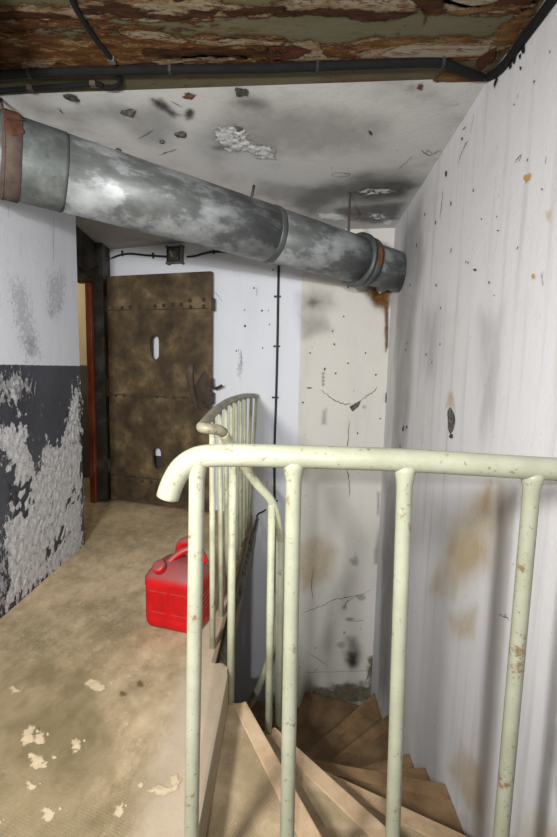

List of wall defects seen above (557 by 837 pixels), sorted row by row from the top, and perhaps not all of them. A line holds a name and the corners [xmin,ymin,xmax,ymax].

peeling [0,0,539,69]
peeling [214,124,277,160]
leakage [316,212,354,221]
corrosion [369,286,390,353]
crack [307,387,377,446]
peeling [0,366,85,615]
crack [303,568,368,622]